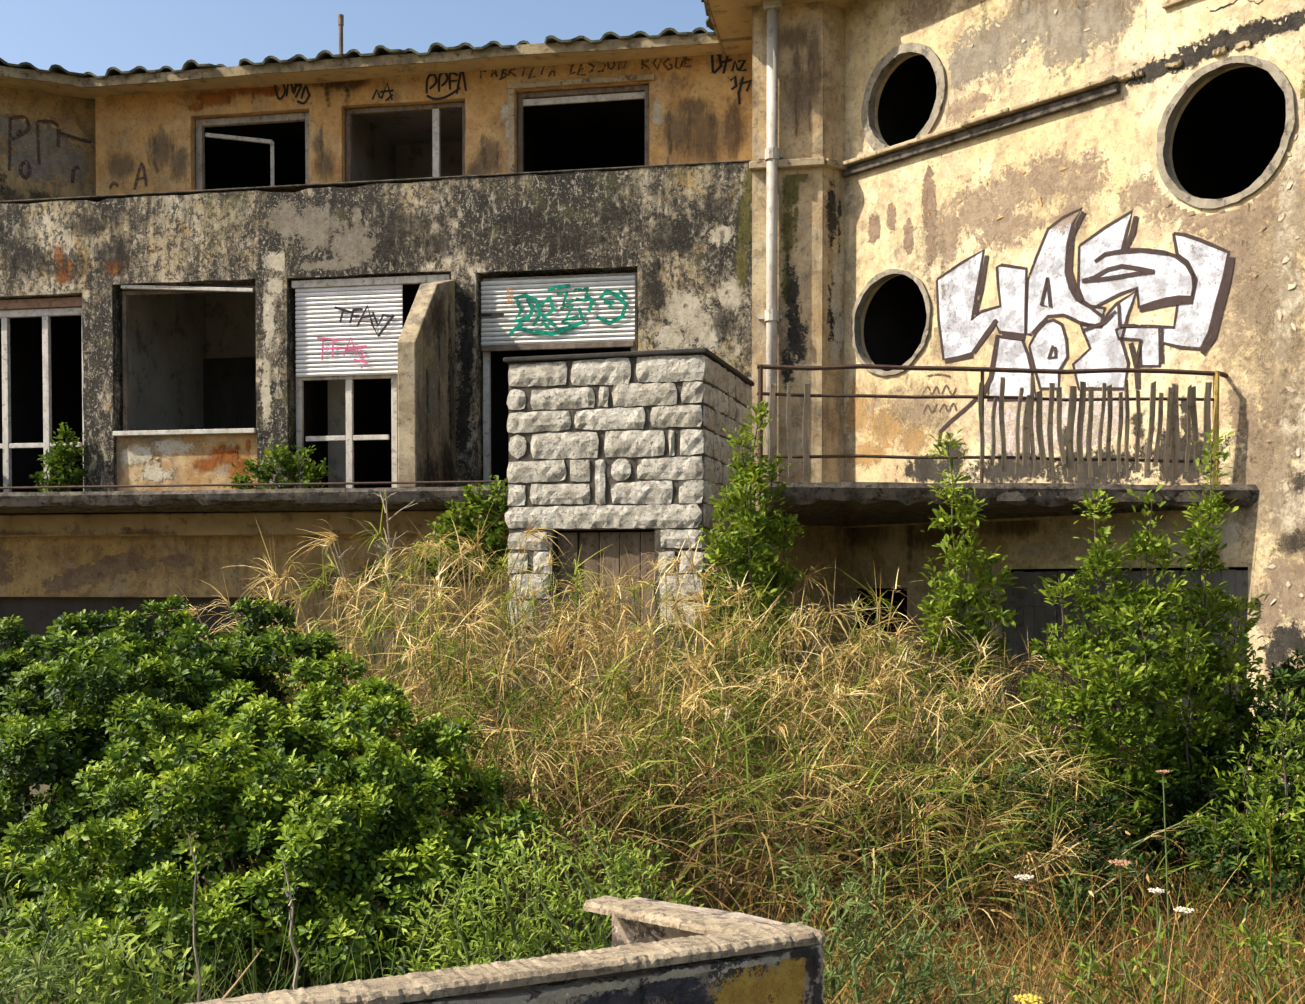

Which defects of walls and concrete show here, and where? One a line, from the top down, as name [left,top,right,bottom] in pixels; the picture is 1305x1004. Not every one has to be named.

crack [1210,0,1264,12]
spalling [1118,9,1305,87]
water stain [0,173,58,201]
water stain [0,209,138,284]
water stain [267,196,459,273]
water stain [777,183,809,392]
water stain [825,175,843,341]
peeling [867,98,1305,640]
peeling [117,437,197,485]
water stain [876,168,1305,702]
peeling [506,957,805,1004]